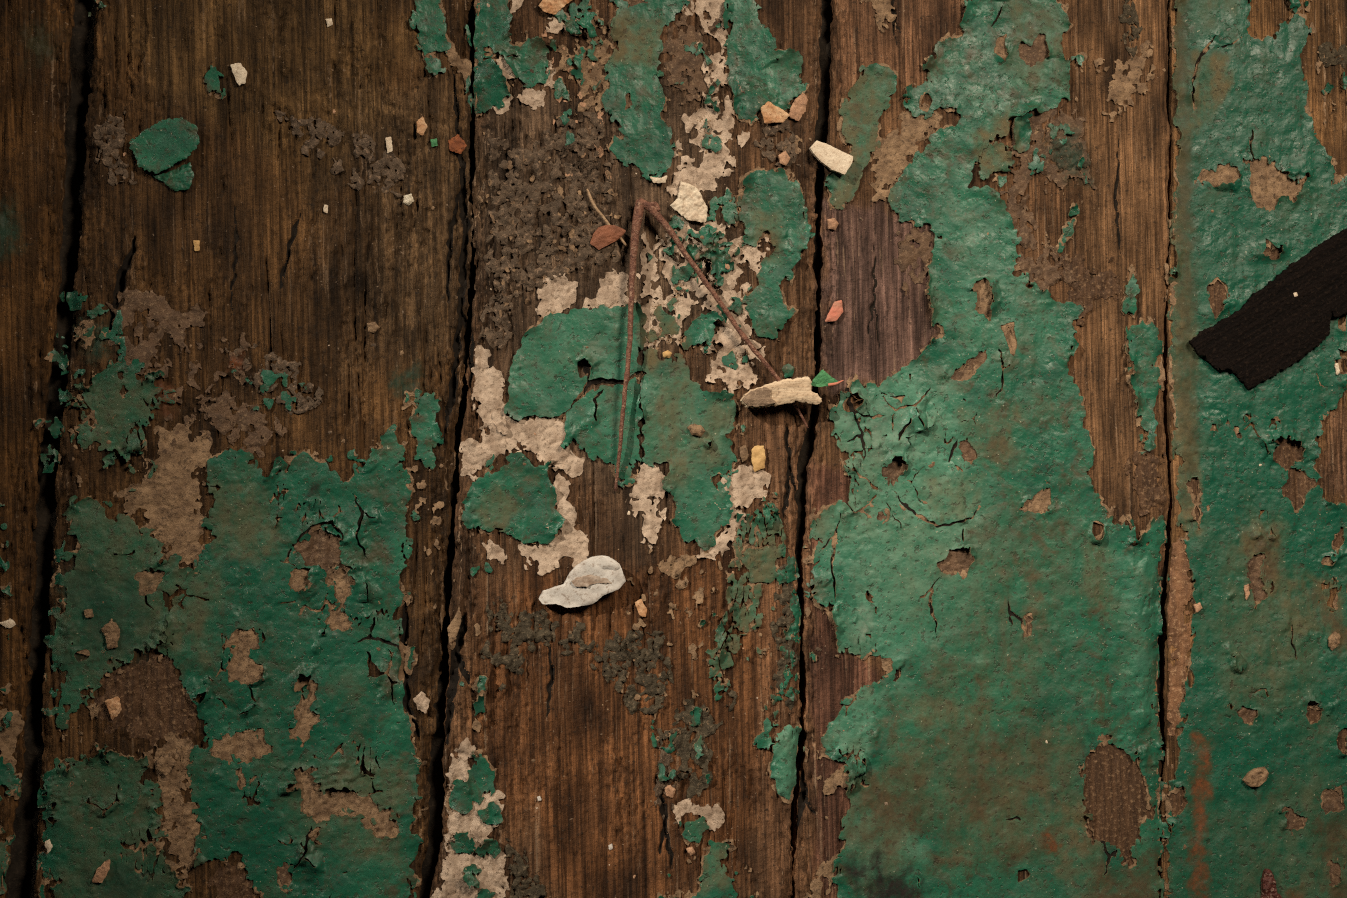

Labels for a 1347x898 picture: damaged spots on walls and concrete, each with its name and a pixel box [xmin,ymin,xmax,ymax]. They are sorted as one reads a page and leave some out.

crack [443,65,475,446]
peeling [0,523,16,651]
peeling [33,290,444,898]
crack [781,426,796,518]
crack [822,513,841,597]
peeling [409,0,1347,898]
crack [845,386,930,458]
crack [897,496,977,540]
crack [948,441,957,462]
peeling [0,681,13,731]
crack [353,602,471,745]
peeling [0,824,16,894]